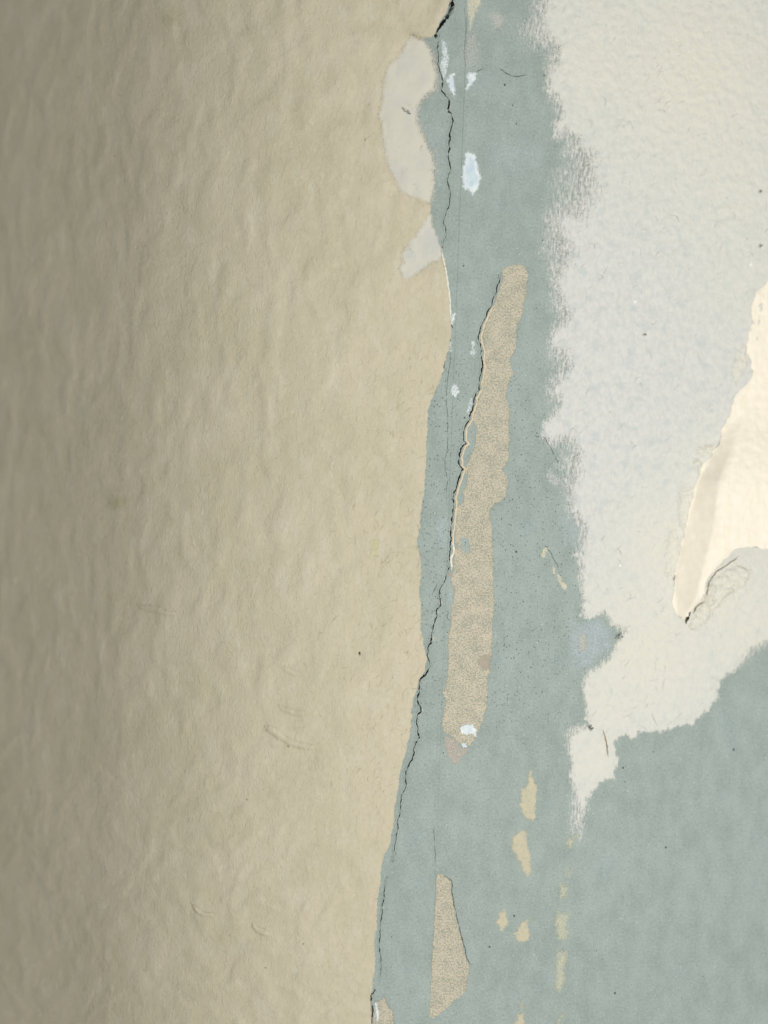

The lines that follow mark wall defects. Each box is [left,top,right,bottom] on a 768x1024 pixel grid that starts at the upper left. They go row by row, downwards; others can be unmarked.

spalling [442,264,529,748]
crack [370,272,503,1023]
spalling [511,770,538,877]
spalling [373,998,394,1024]
spalling [429,873,470,1019]
spalling [495,908,531,943]